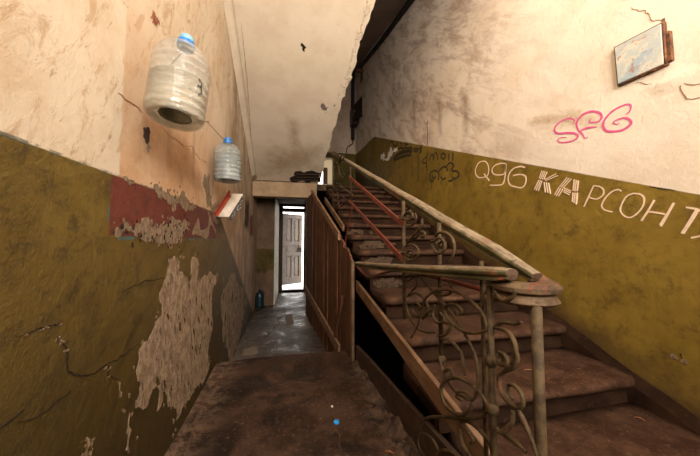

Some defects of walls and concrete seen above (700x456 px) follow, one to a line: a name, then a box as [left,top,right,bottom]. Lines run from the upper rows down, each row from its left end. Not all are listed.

crack [0,323,139,429]
peeling [113,174,247,453]